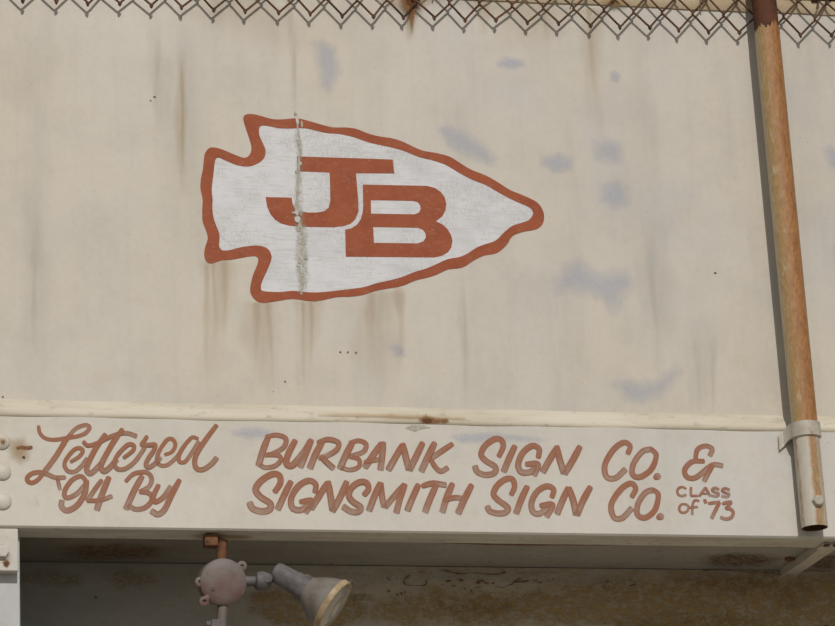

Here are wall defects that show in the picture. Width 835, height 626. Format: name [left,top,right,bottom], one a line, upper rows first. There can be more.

rust [403,0,419,26]
crack [292,111,308,295]
rust [420,415,448,424]